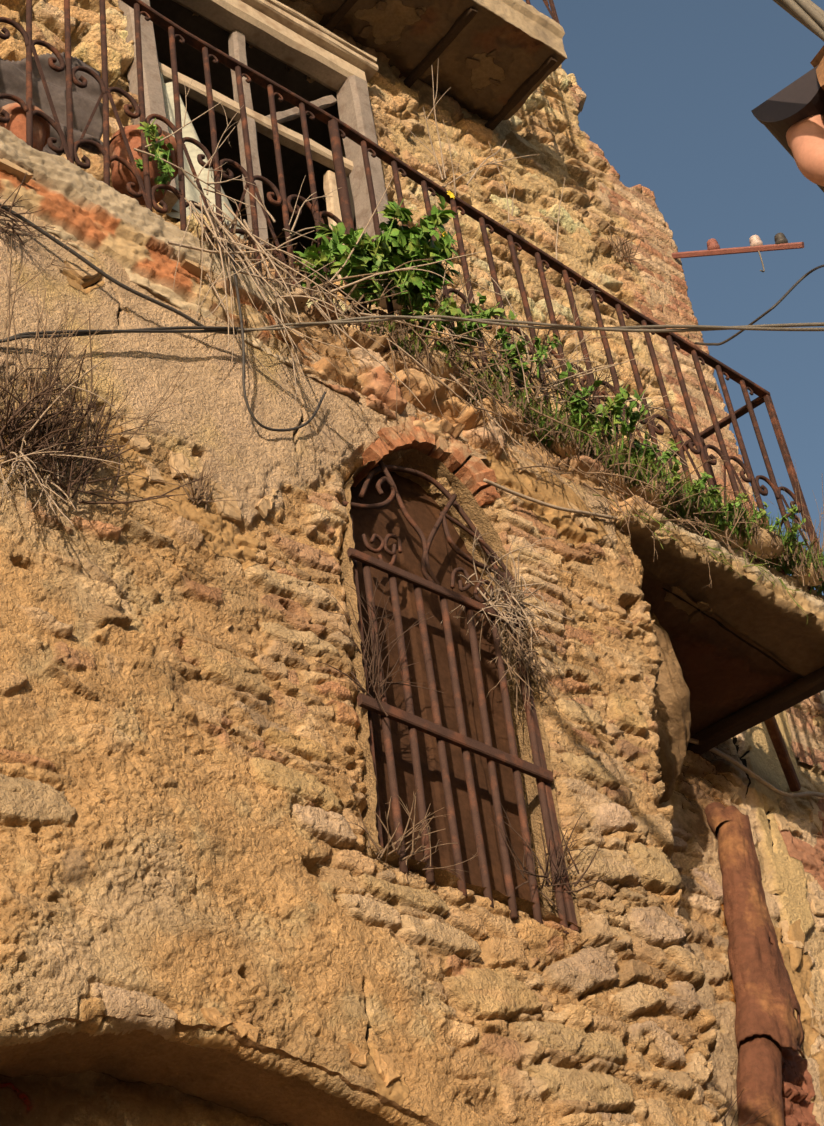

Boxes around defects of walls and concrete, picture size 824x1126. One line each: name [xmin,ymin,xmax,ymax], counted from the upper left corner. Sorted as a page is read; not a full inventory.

flaking render [97,419,278,570]
spalling [774,798,824,916]
crack [362,980,377,1055]
flaking render [774,919,824,1098]
corrosion [782,1048,820,1126]